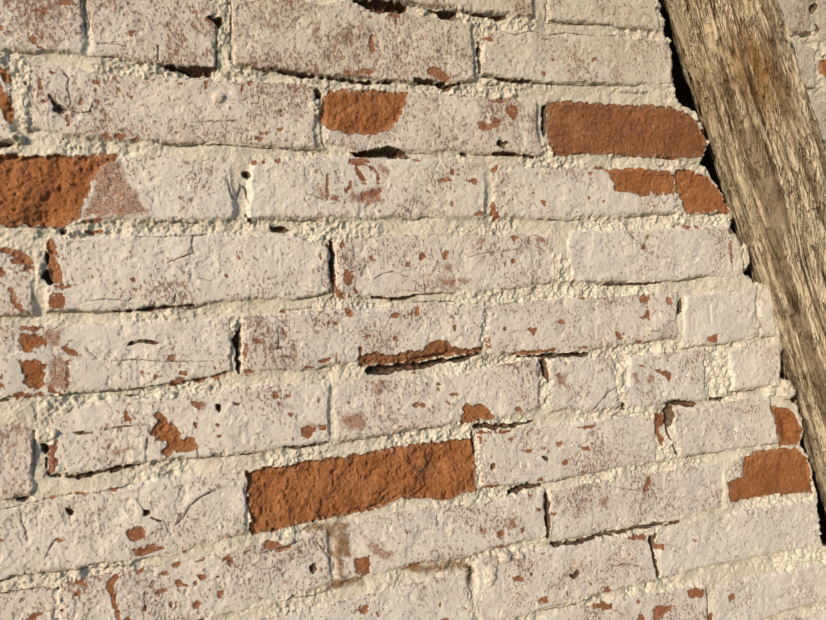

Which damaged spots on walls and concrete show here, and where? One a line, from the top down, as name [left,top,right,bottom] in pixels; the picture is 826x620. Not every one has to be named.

spalling [320,89,409,136]
spalling [544,100,730,214]
spalling [0,153,149,235]
peeling [0,267,26,314]
peeling [0,246,35,271]
spalling [46,239,72,309]
spalling [13,325,78,401]
spalling [358,335,492,374]
spalling [150,412,199,458]
spalling [245,402,513,553]
spalling [728,405,813,503]